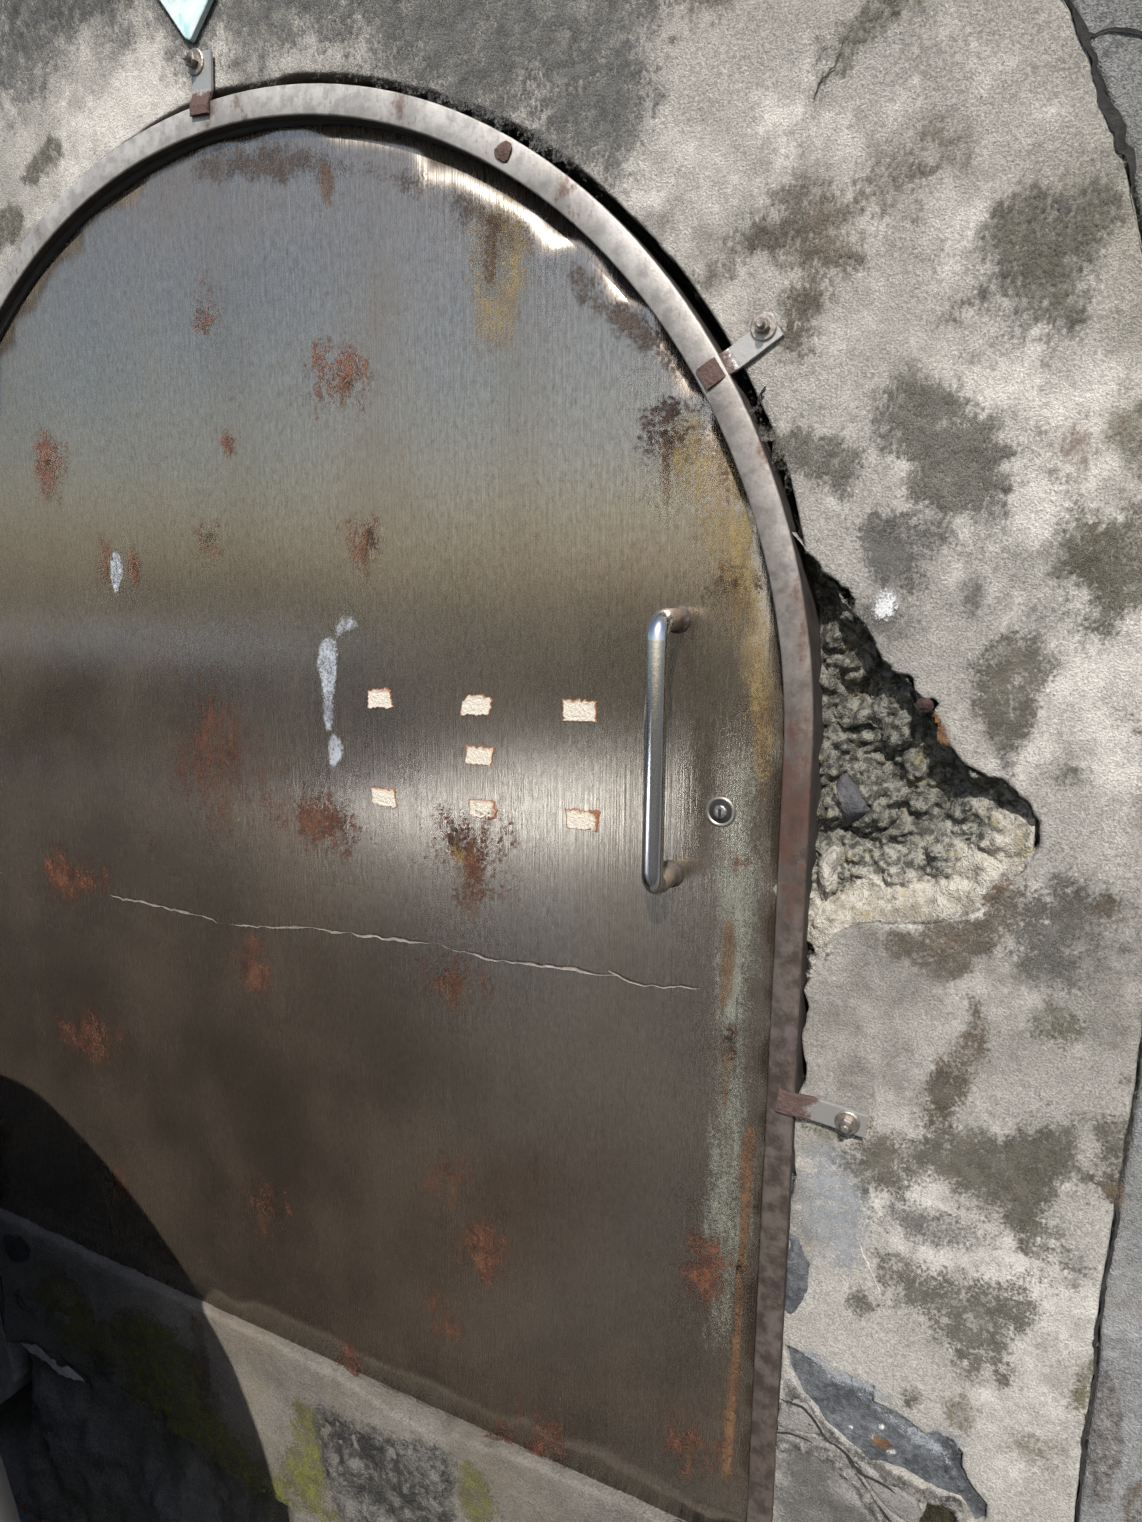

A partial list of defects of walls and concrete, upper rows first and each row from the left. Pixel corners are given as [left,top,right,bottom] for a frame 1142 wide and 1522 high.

damp [0,0,722,186]
crack [1065,0,1142,244]
damp [0,201,23,252]
damp [932,153,1126,366]
corrosion [290,336,374,427]
corrosion [276,783,375,859]
corrosion [408,800,536,910]
spalling [795,517,1040,978]
corrosion [673,1127,755,1482]
spalling [770,1345,987,1522]